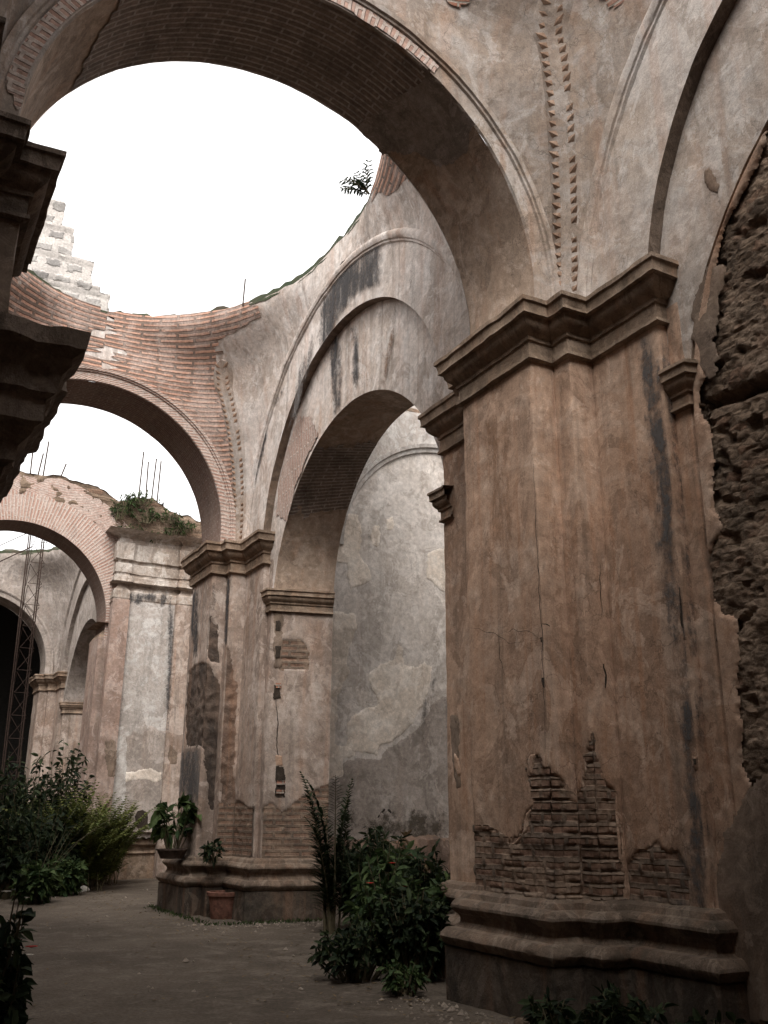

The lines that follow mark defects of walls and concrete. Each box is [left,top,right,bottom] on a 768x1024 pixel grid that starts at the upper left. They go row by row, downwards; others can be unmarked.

water stain [292,246,380,417]
water stain [641,339,690,574]
crack [474,469,549,705]
flaking render [104,612,329,858]
flaking render [472,732,691,906]